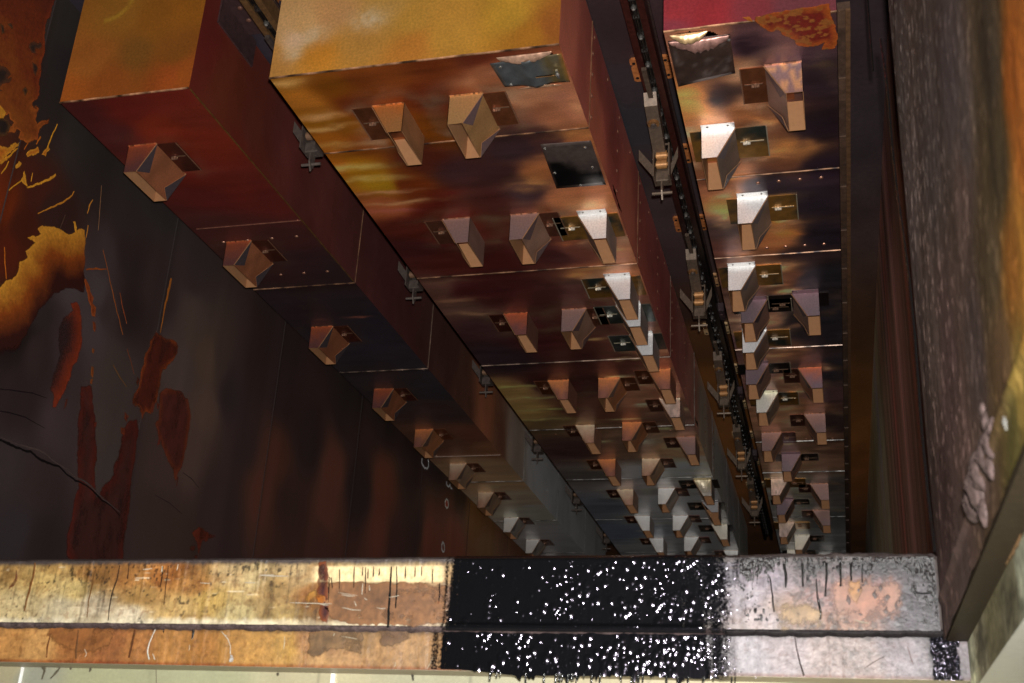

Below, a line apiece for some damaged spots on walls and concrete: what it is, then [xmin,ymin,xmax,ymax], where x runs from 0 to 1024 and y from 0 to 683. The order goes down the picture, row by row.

corrosion [743,4,838,50]
crack [0,388,120,516]
corrosion [67,278,191,559]
corrosion [306,561,333,622]